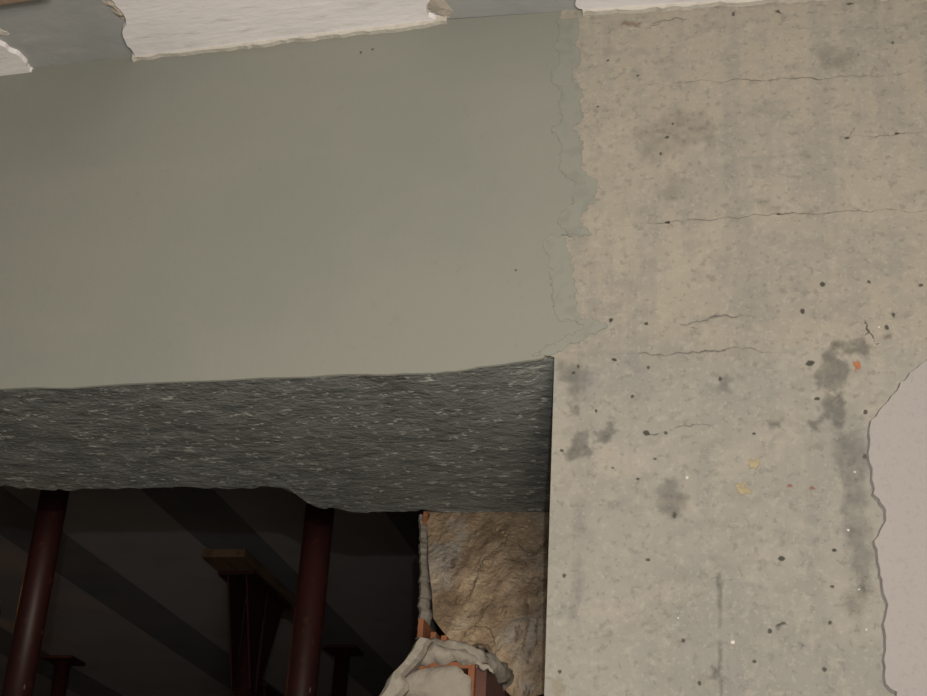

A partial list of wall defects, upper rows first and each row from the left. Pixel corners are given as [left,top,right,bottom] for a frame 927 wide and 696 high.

flaking render [0,0,133,68]
flaking render [427,0,927,696]